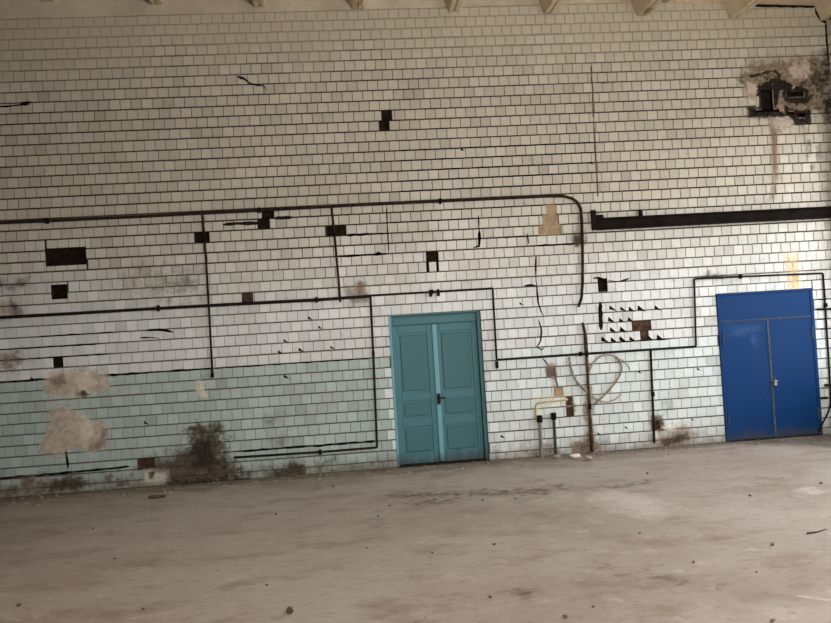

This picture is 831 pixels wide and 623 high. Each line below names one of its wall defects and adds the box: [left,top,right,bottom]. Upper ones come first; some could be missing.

spalling [740,59,826,129]
peeling [379,110,392,131]
peeling [538,204,561,236]
peeling [45,247,86,266]
peeling [601,305,662,342]
peeling [31,358,109,398]
peeling [40,407,105,454]